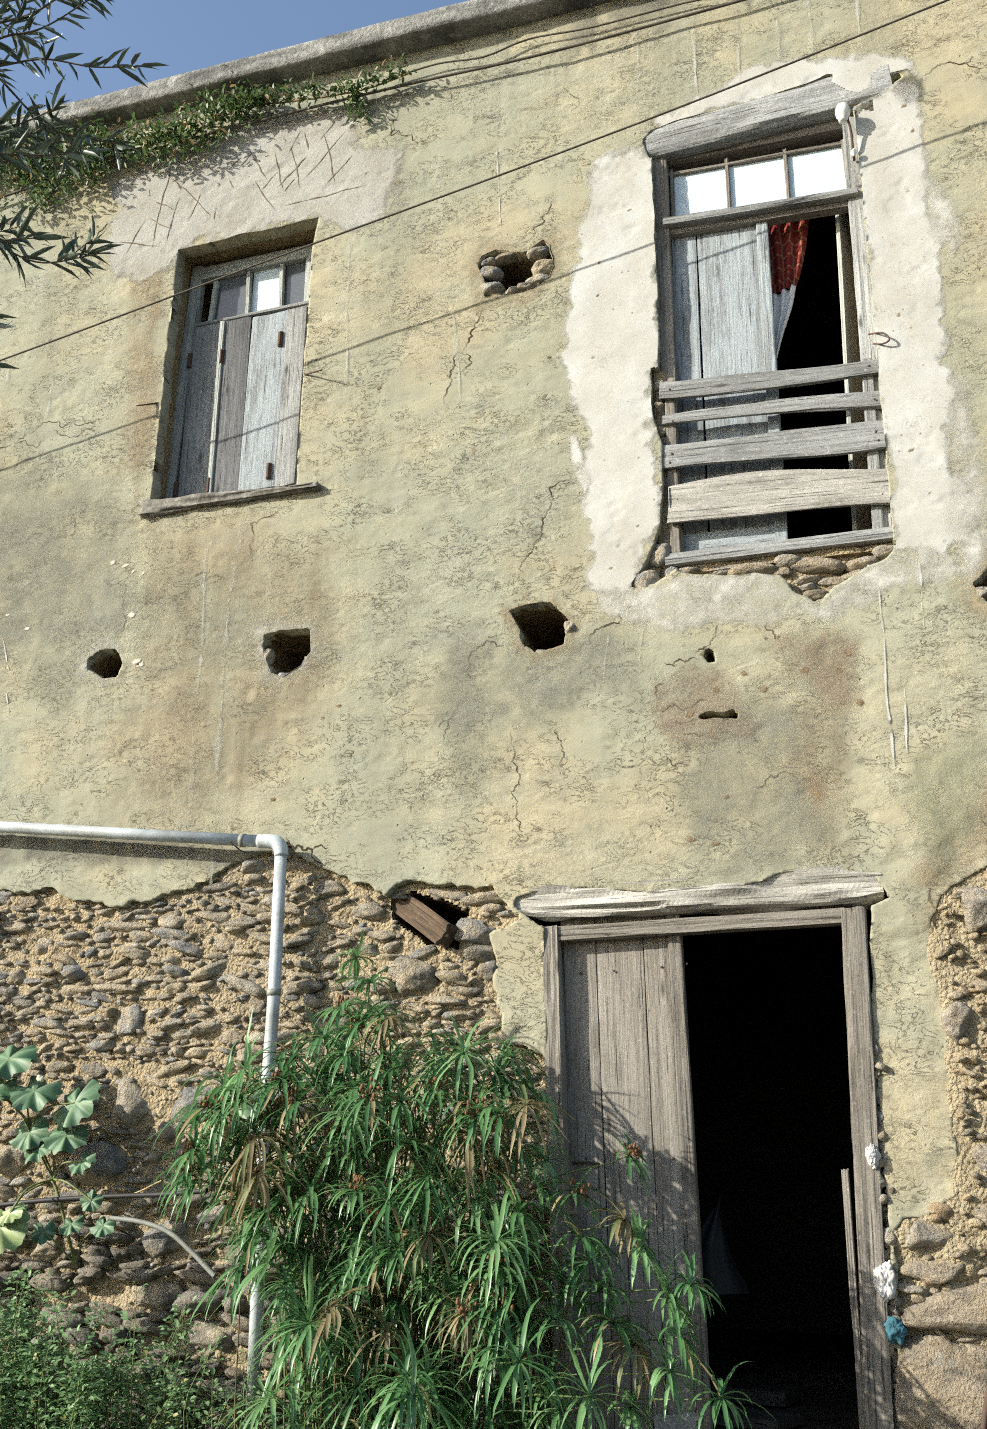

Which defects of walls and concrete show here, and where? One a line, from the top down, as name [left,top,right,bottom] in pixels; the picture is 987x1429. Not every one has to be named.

crack [443,310,482,404]
peeling [470,52,987,639]
crack [518,470,581,587]
spalling [255,623,312,680]
spalling [505,600,575,661]
flaking render [0,845,554,1429]
flaking render [883,866,987,1429]